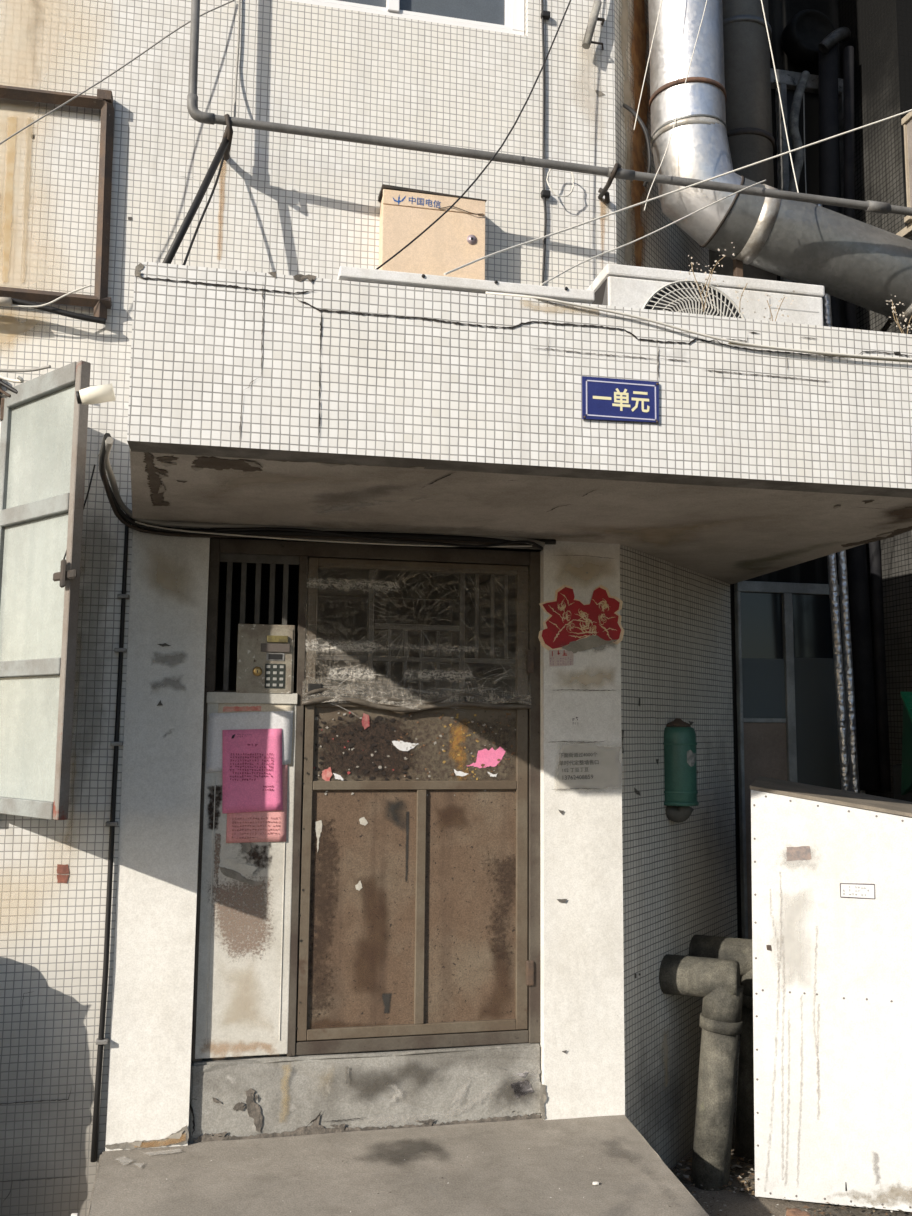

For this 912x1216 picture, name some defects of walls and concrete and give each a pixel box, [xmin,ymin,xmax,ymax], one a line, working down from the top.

corrosion [620,0,650,267]
crack [139,277,912,442]
water stain [888,508,912,524]
spalling [105,1066,547,1149]